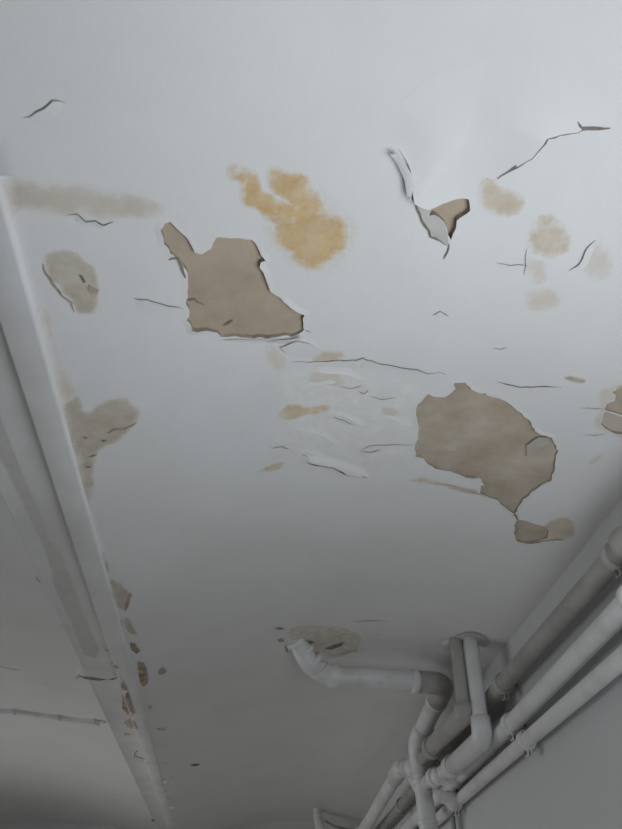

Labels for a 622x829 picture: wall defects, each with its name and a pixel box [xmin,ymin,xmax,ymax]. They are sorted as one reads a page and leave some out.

crack [24,100,65,124]
leakage [225,161,361,274]
flaking render [412,196,475,259]
leakage [477,178,526,218]
leakage [37,307,142,505]
flaking render [154,217,576,545]
crack [299,357,444,400]
crack [486,382,561,399]
flaking render [593,383,622,440]
flaking render [104,561,149,686]